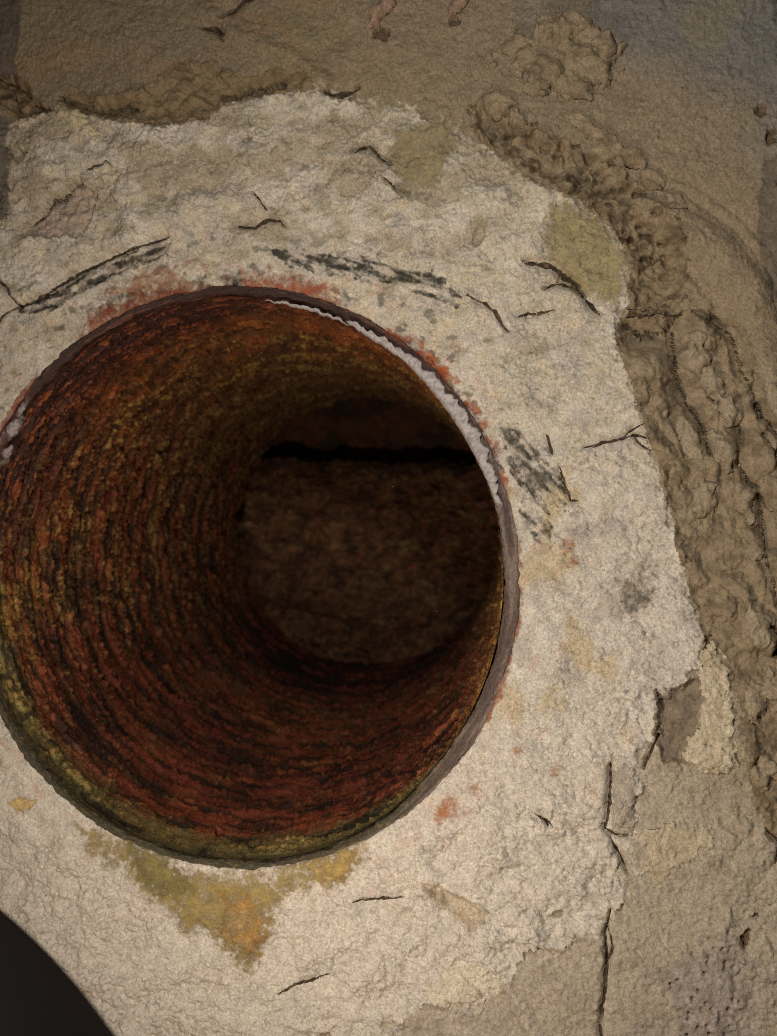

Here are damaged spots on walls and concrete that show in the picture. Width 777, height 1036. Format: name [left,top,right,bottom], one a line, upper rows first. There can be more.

spalling [0,57,316,141]
peeling [24,183,98,238]
crack [0,238,168,322]
spalling [19,246,168,314]
rust [85,269,209,331]
rust [240,266,337,304]
spalling [272,249,462,309]
rust [387,329,459,383]
spalling [467,98,777,842]
rust [436,798,455,821]
crack [604,762,628,870]
crack [598,909,614,1036]